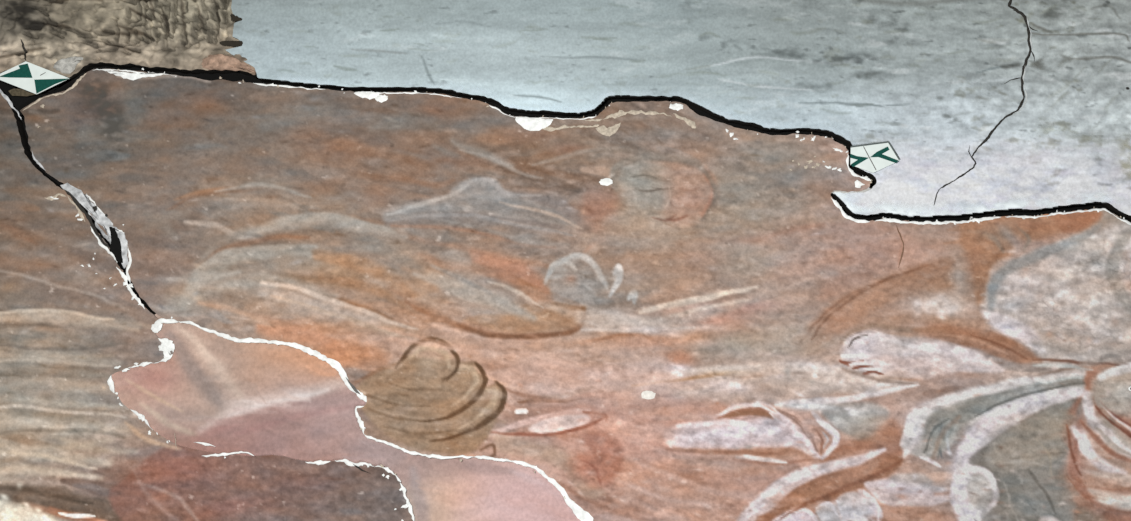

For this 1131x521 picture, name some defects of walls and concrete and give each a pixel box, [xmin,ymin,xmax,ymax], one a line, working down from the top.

flaking render [0,0,258,81]
crack [0,0,1131,309]
peeling [542,110,696,136]